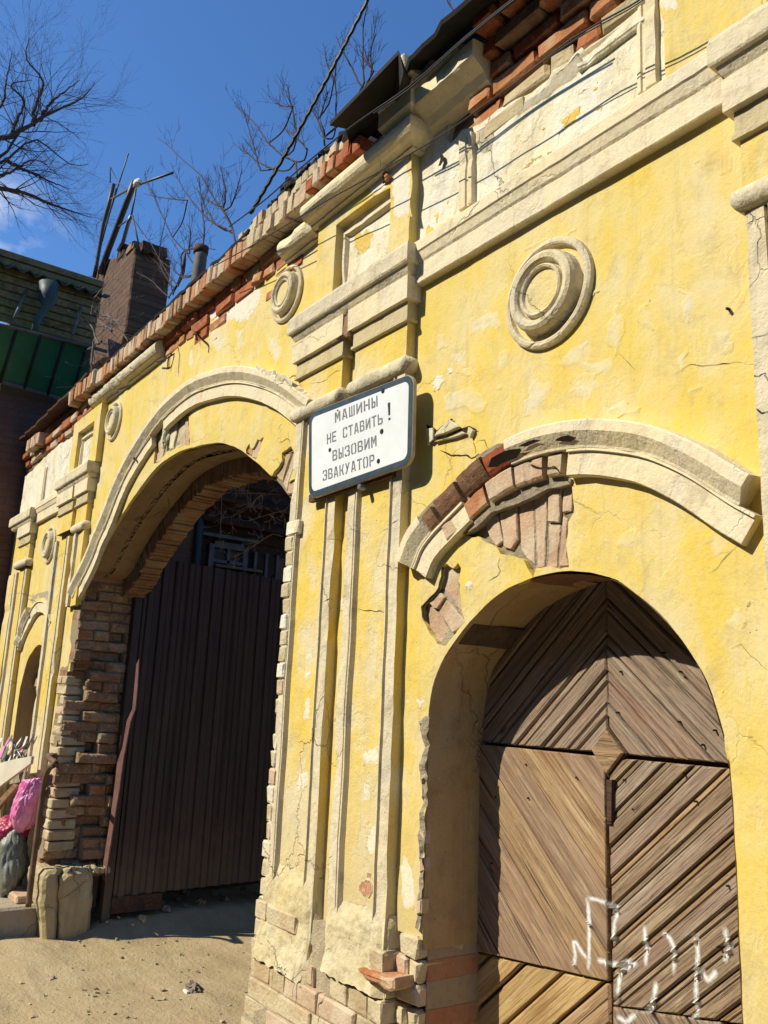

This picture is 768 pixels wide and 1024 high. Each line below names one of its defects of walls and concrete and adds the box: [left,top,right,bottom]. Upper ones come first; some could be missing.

flaking render [477,127,495,153]
peeling [561,106,585,143]
peeling [426,311,501,446]
spalling [471,486,574,572]
spalling [422,566,473,645]
spalling [399,696,431,930]